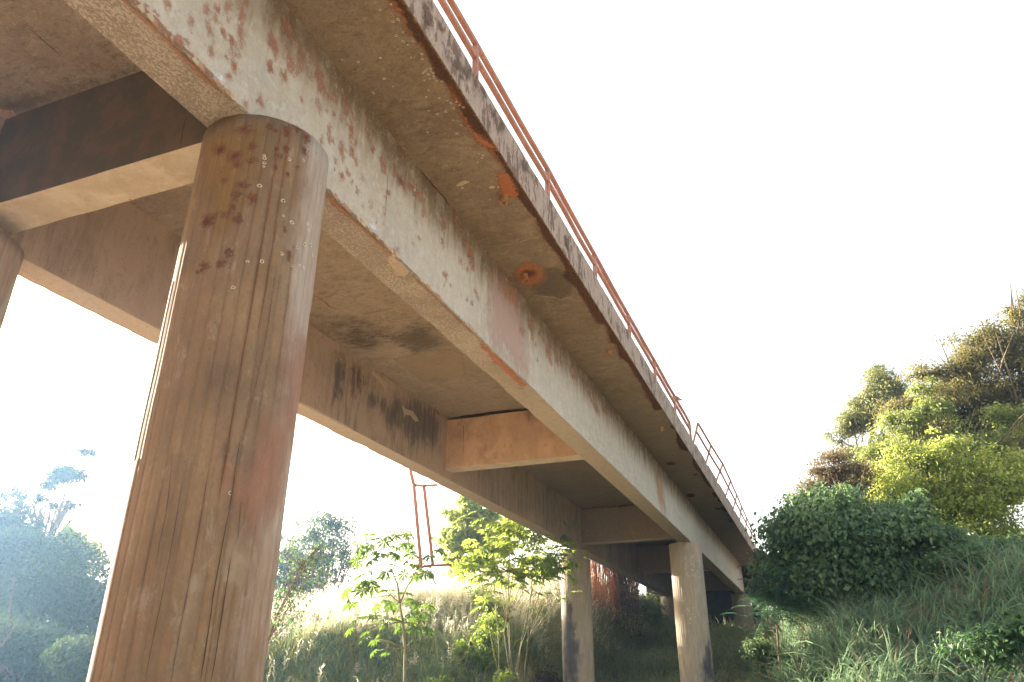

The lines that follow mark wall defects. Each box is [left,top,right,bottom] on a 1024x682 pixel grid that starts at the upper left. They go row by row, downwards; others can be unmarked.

spalling [325,189,486,344]
corrosion [498,171,519,198]
leakage [387,0,662,410]
corrosion [481,344,526,386]